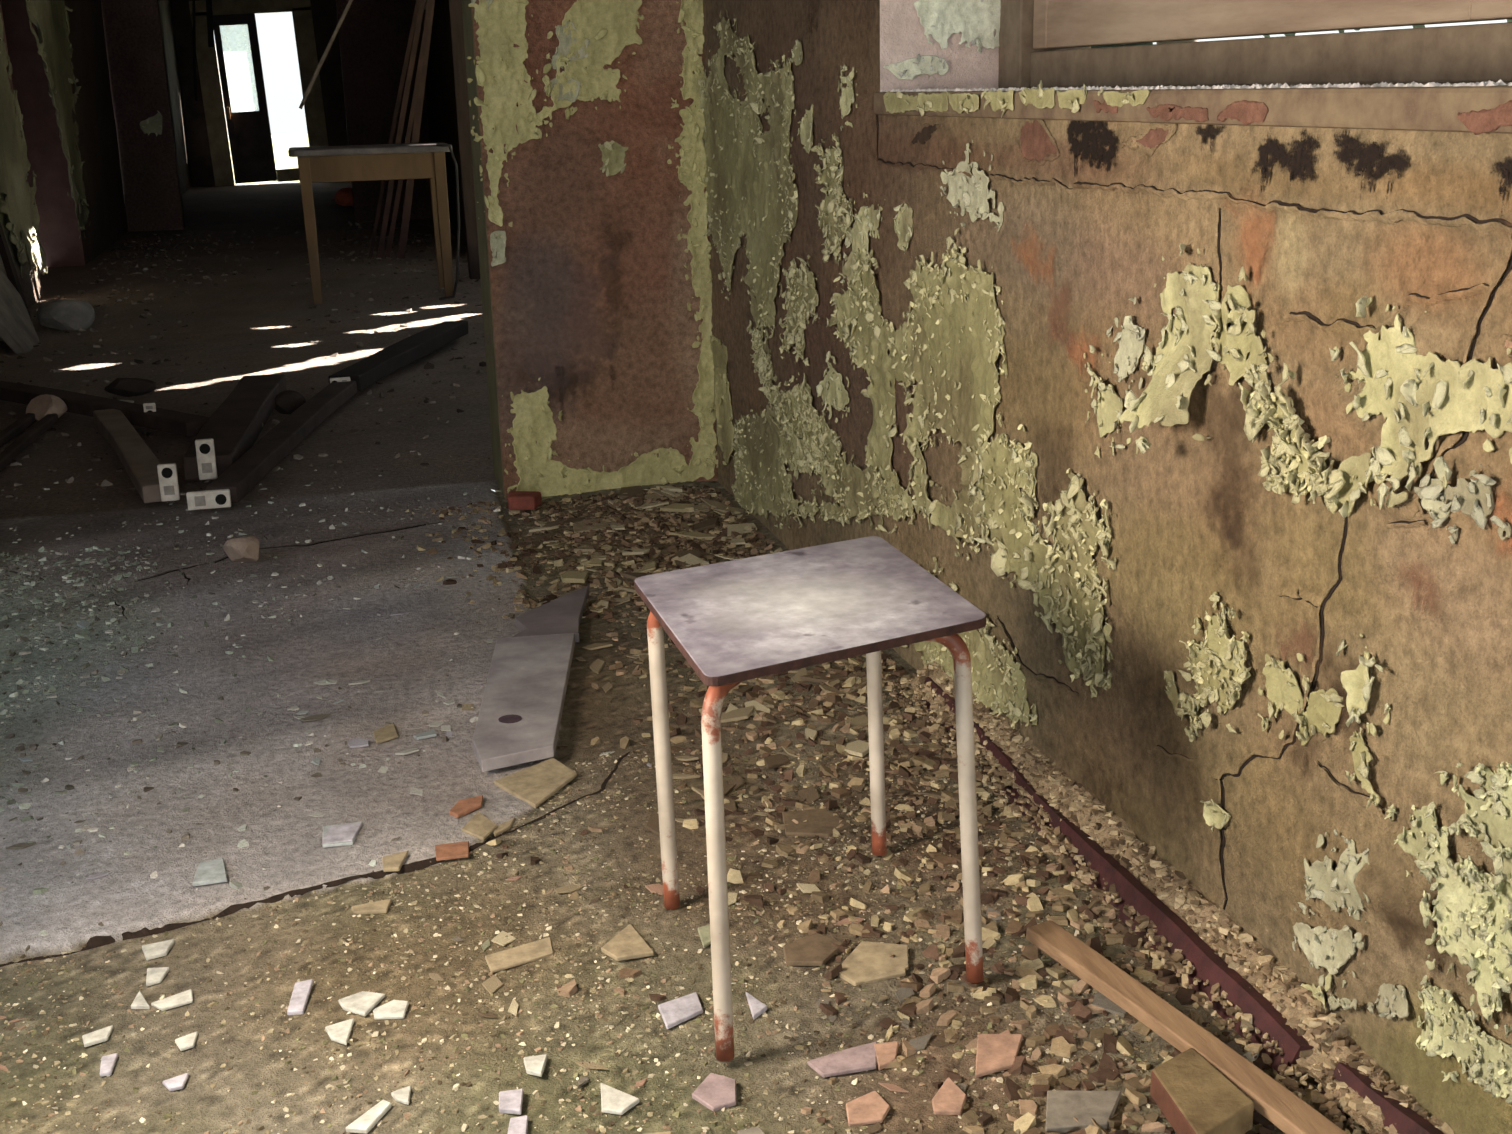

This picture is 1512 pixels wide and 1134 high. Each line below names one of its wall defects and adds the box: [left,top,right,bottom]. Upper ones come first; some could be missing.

peeling [0,12,48,282]
peeling [467,0,644,267]
peeling [502,0,1116,698]
mould [1067,121,1118,177]
crack [875,114,1512,365]
leakage [1196,125,1224,153]
peeling [1083,243,1512,544]
mould [1251,129,1409,197]
crack [1385,431,1469,529]
mould [1491,157,1512,216]
crack [1147,517,1385,910]
peeling [1164,591,1512,1104]